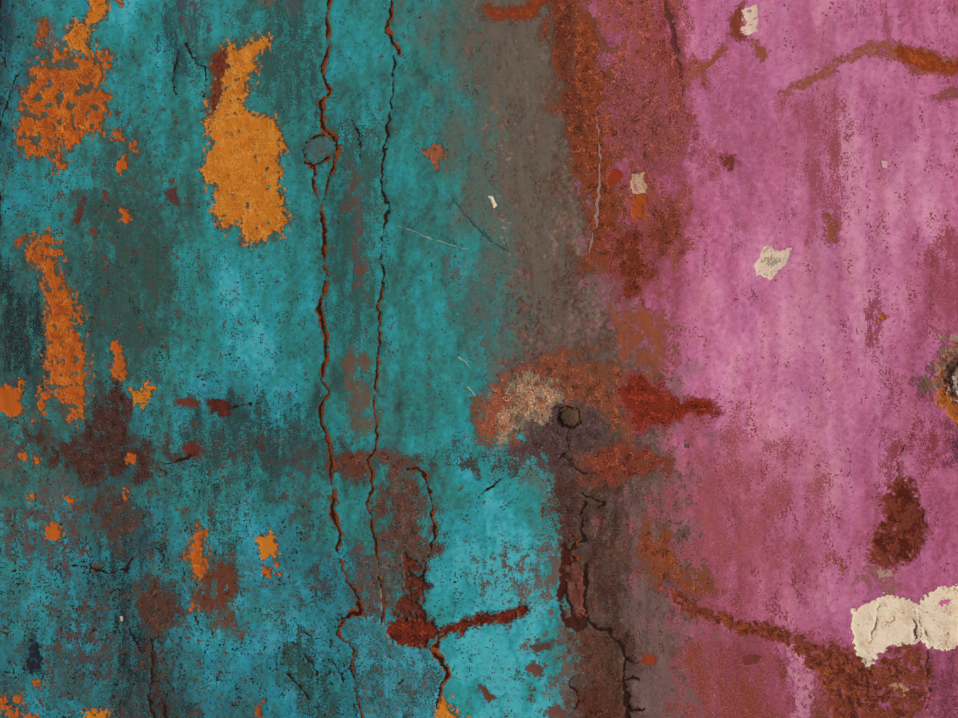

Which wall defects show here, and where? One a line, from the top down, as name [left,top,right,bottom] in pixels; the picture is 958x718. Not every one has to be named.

peeling [12,0,181,228]
peeling [194,30,296,251]
corrosion [779,37,958,105]
peeling [0,226,96,428]
corrosion [0,69,490,718]
crack [234,0,402,718]
corrosion [452,0,877,718]
crack [406,466,438,579]
crack [422,634,452,710]
crack [558,429,645,718]
spalling [783,584,958,718]
corrosion [851,471,934,595]